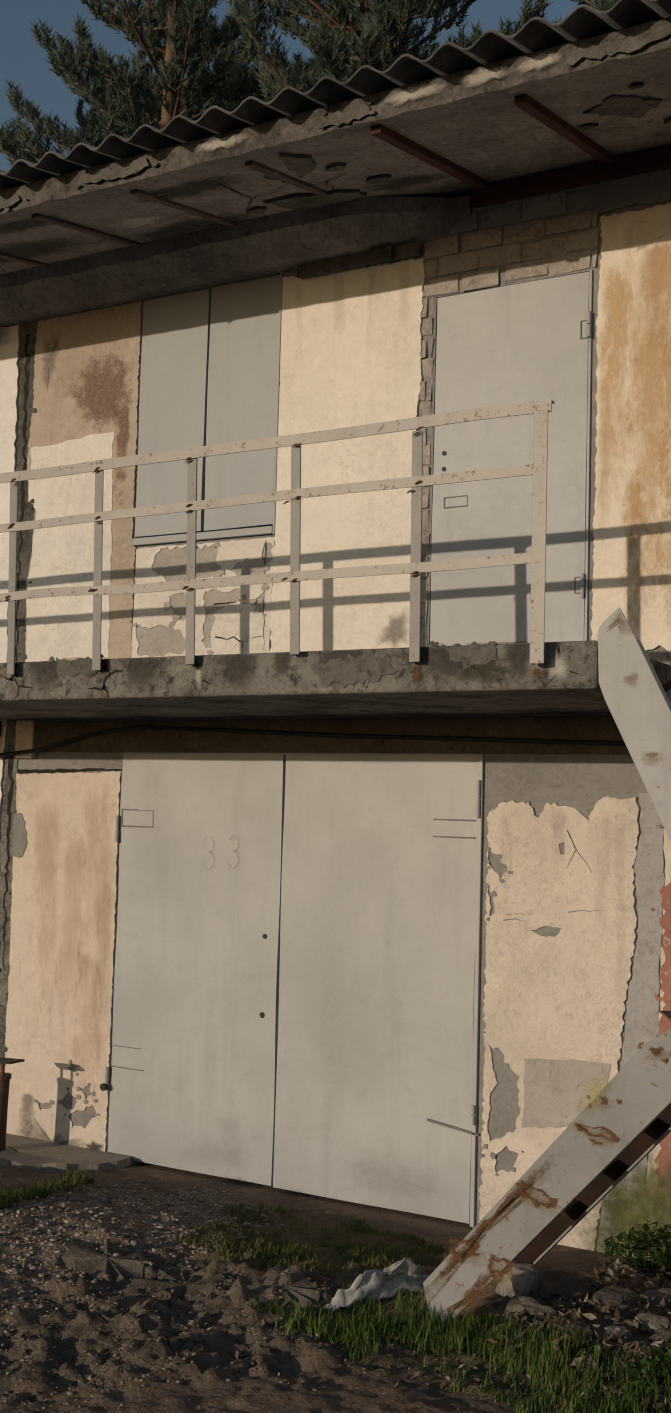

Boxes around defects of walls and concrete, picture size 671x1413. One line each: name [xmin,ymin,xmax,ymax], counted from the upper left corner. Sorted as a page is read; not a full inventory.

spalling [566,24,671,66]
damp [72,357,128,481]
peeling [127,542,275,657]
crack [0,756,121,972]
peeling [484,846,513,921]
spalling [532,926,561,937]
damp [23,1096,32,1116]
peeling [34,1060,100,1128]
damp [39,1131,101,1151]
peeling [480,1031,524,1176]
corrosion [575,1123,619,1145]
corrosion [440,1176,557,1312]